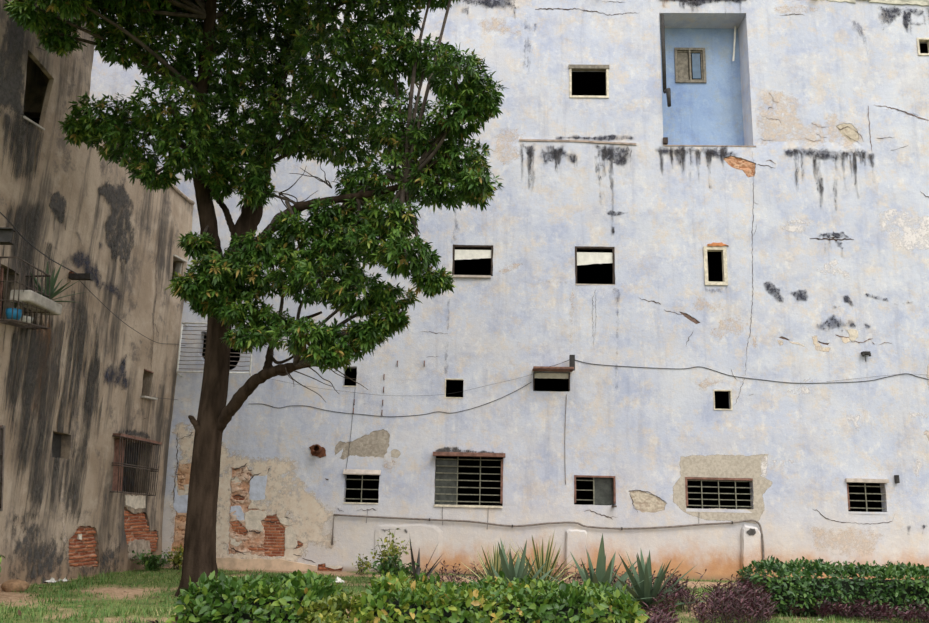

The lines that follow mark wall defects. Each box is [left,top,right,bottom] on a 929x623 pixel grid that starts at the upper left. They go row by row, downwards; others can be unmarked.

crack [536,1,635,15]
crack [868,106,928,150]
water stain [658,147,735,166]
flaking render [723,156,774,177]
water stain [786,148,874,192]
water stain [98,182,134,273]
water stain [74,251,120,299]
crack [731,158,757,405]
flaking render [309,429,401,467]
flaking render [124,495,158,560]
peeling [216,446,343,571]
flaking render [629,490,667,513]